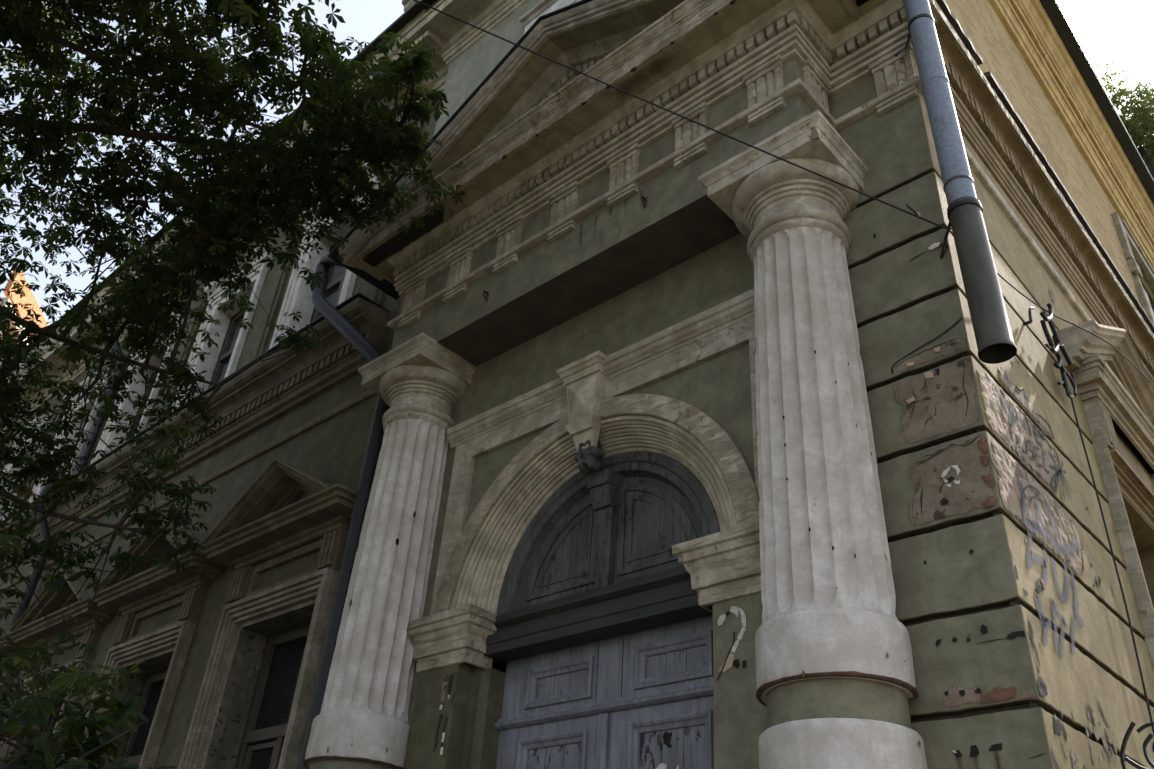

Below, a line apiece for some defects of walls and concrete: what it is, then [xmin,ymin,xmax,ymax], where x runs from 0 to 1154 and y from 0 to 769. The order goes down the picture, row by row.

spalling [890,317,1114,596]
peeling [433,674,455,755]
peeling [663,731,672,748]
spalling [943,684,1037,707]
peeling [1054,704,1118,769]